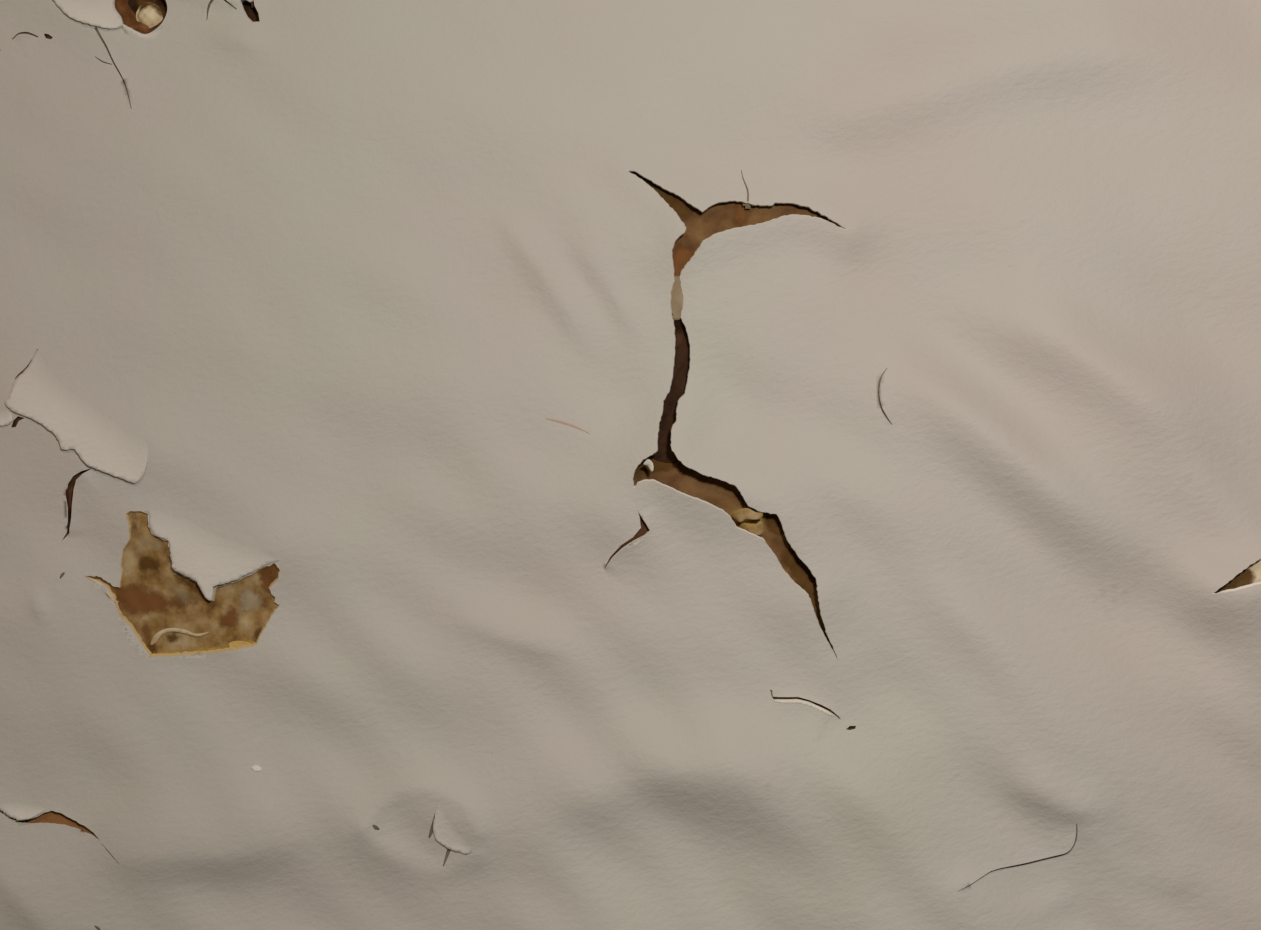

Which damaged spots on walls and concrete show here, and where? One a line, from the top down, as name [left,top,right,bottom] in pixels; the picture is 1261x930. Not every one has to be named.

peeling [53,0,163,109]
peeling [0,349,149,539]
crack [603,170,847,659]
spalling [85,509,280,657]
crack [1212,559,1261,594]
crack [770,690,856,730]
crack [957,824,1077,892]